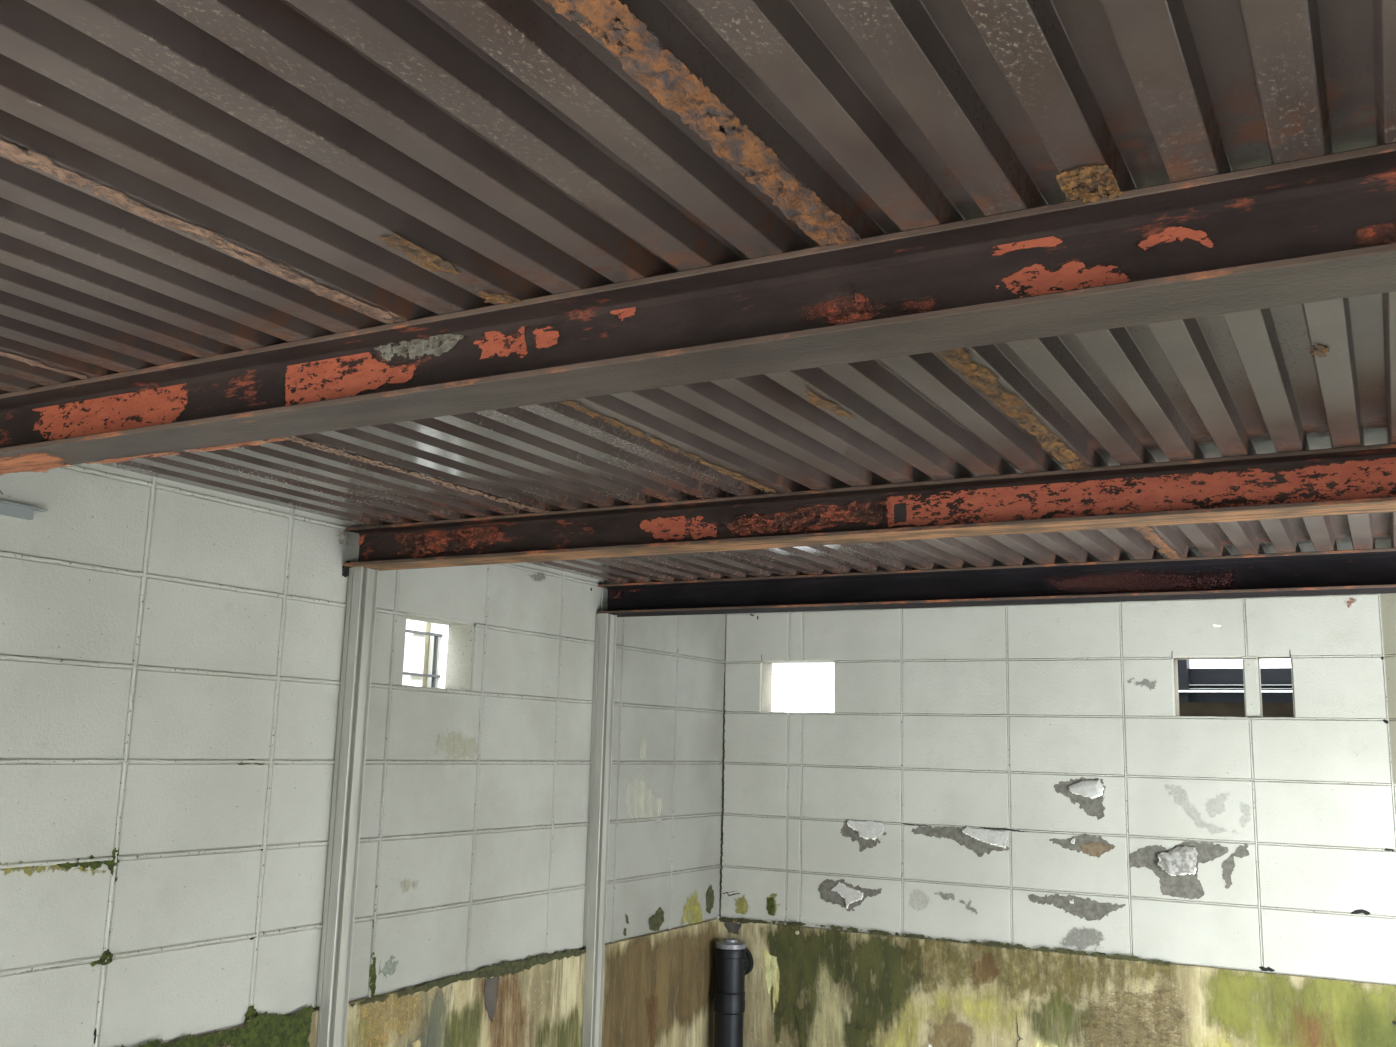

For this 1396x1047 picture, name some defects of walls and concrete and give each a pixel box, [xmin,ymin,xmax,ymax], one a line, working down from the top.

corrosion [1056,165,1122,203]
corrosion [380,234,461,275]
corrosion [479,291,522,304]
corrosion [0,438,286,475]
peeling [911,825,1009,857]
peeling [1050,834,1250,899]
peeling [818,879,882,911]
peeling [1028,894,1125,921]
damp [1061,928,1103,949]
damp [764,925,924,1047]
damp [408,991,450,1047]
damp [1207,969,1396,1047]